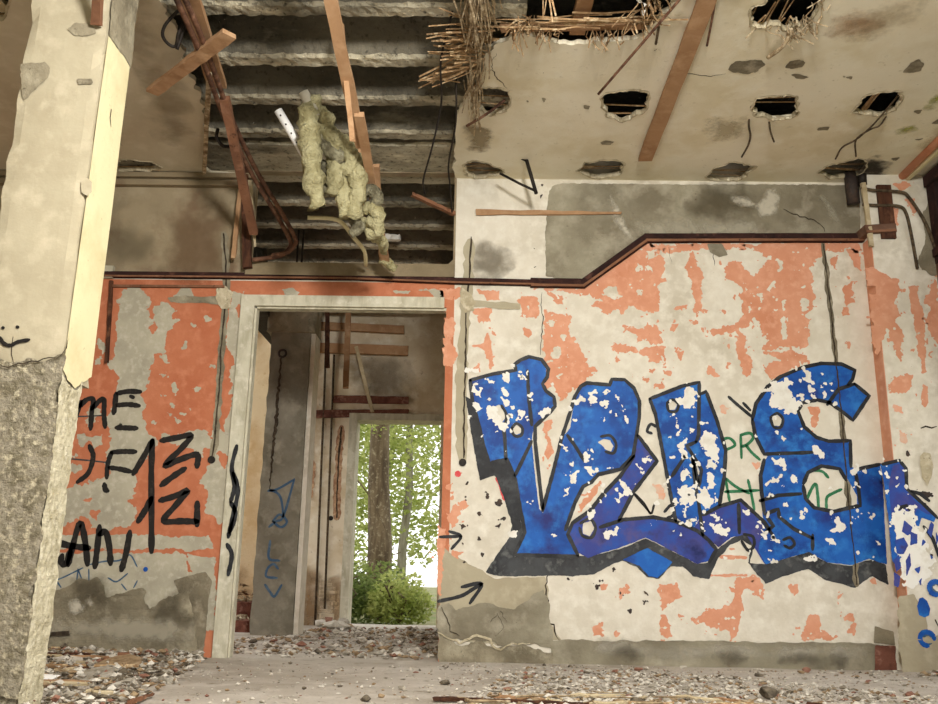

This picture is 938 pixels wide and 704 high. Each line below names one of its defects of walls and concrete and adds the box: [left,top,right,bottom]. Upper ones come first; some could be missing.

water stain [646,189,779,233]
flaking render [0,284,244,704]
flaking render [393,181,938,672]